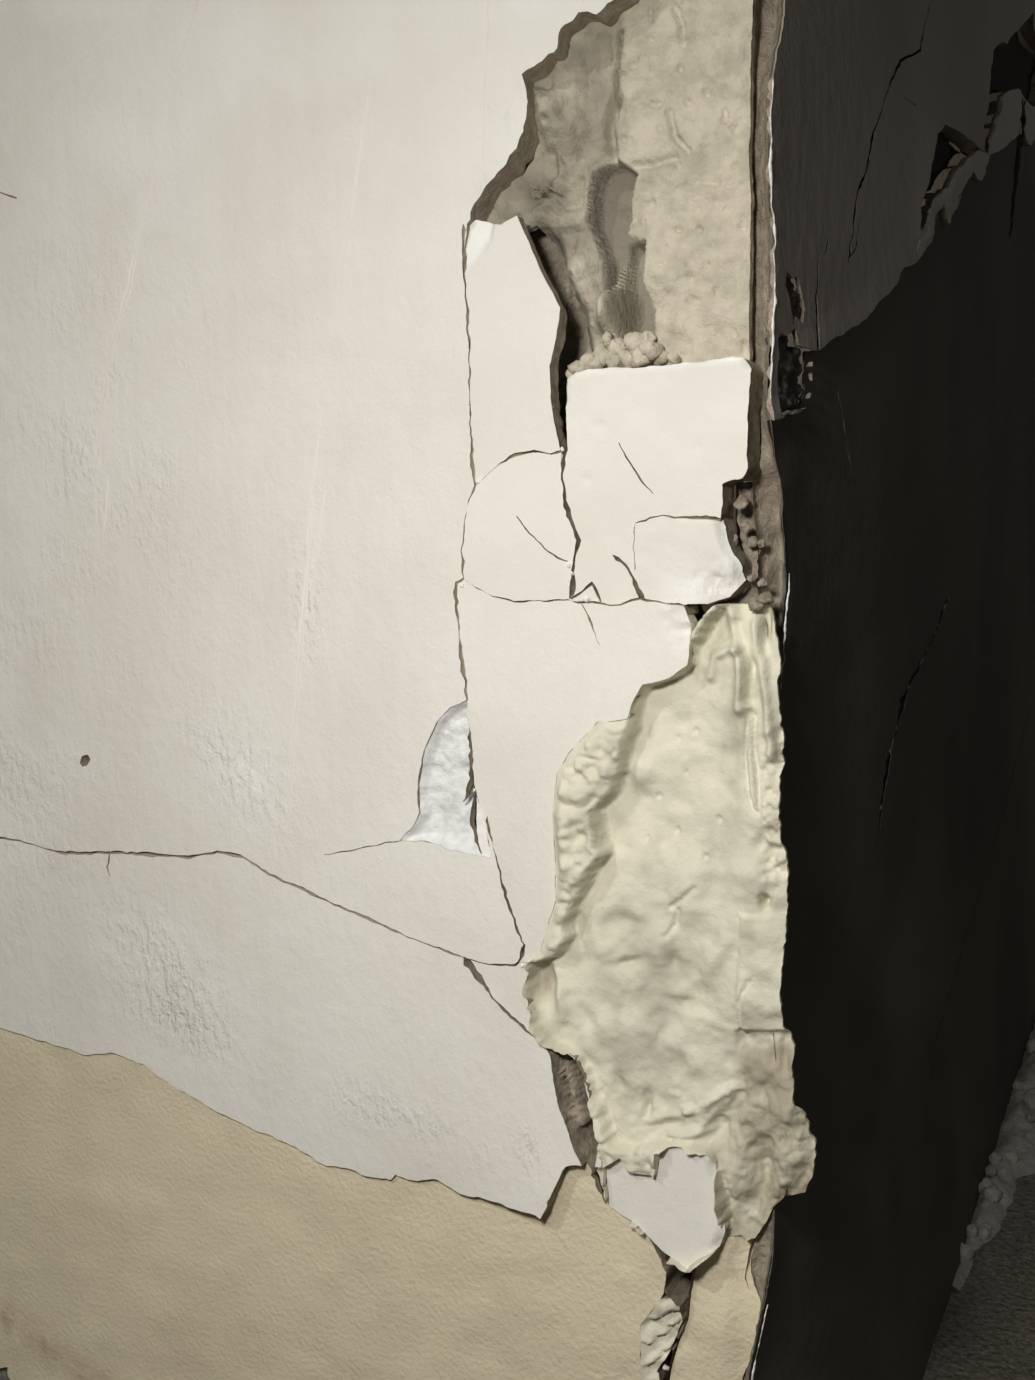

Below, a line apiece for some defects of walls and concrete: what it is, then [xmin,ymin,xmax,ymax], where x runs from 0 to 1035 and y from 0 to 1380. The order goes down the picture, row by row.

crack [813,14,928,352]
crack [0,226,721,1203]
flaking render [400,700,491,859]
peeling [461,0,1035,1380]
crack [879,598,948,828]
flaking render [0,1028,669,1380]
crack [640,1241,696,1380]